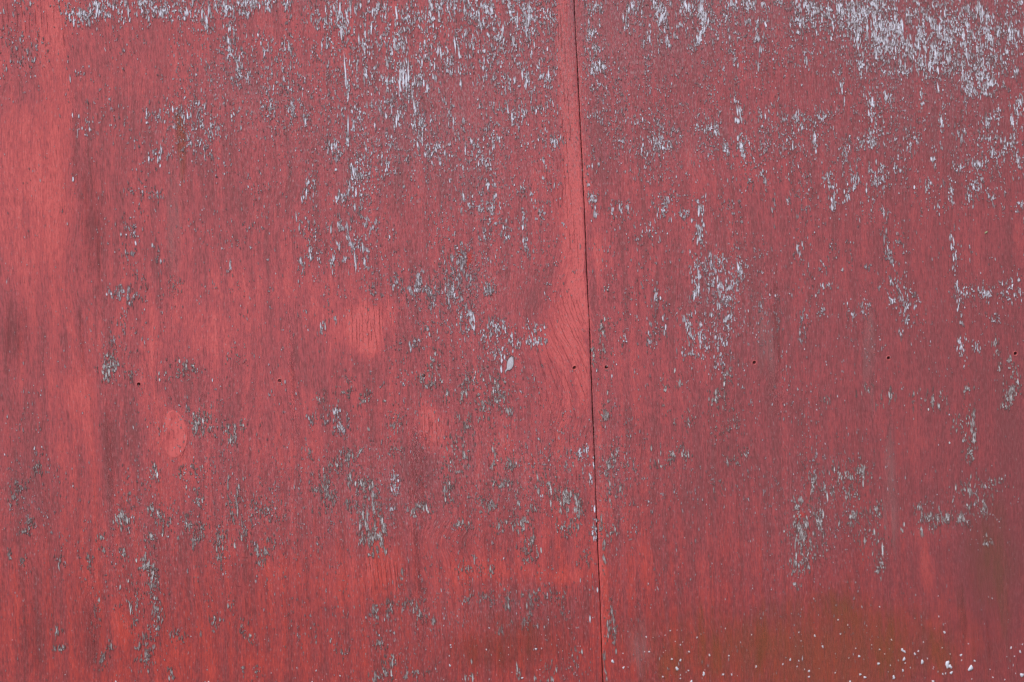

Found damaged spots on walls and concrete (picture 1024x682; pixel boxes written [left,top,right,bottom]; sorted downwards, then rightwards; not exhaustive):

peeling [53,0,637,577]
peeling [584,0,1024,471]
peeling [86,458,286,674]
peeling [368,566,437,682]
peeling [463,587,568,635]
peeling [534,637,583,682]
peeling [773,383,1014,591]